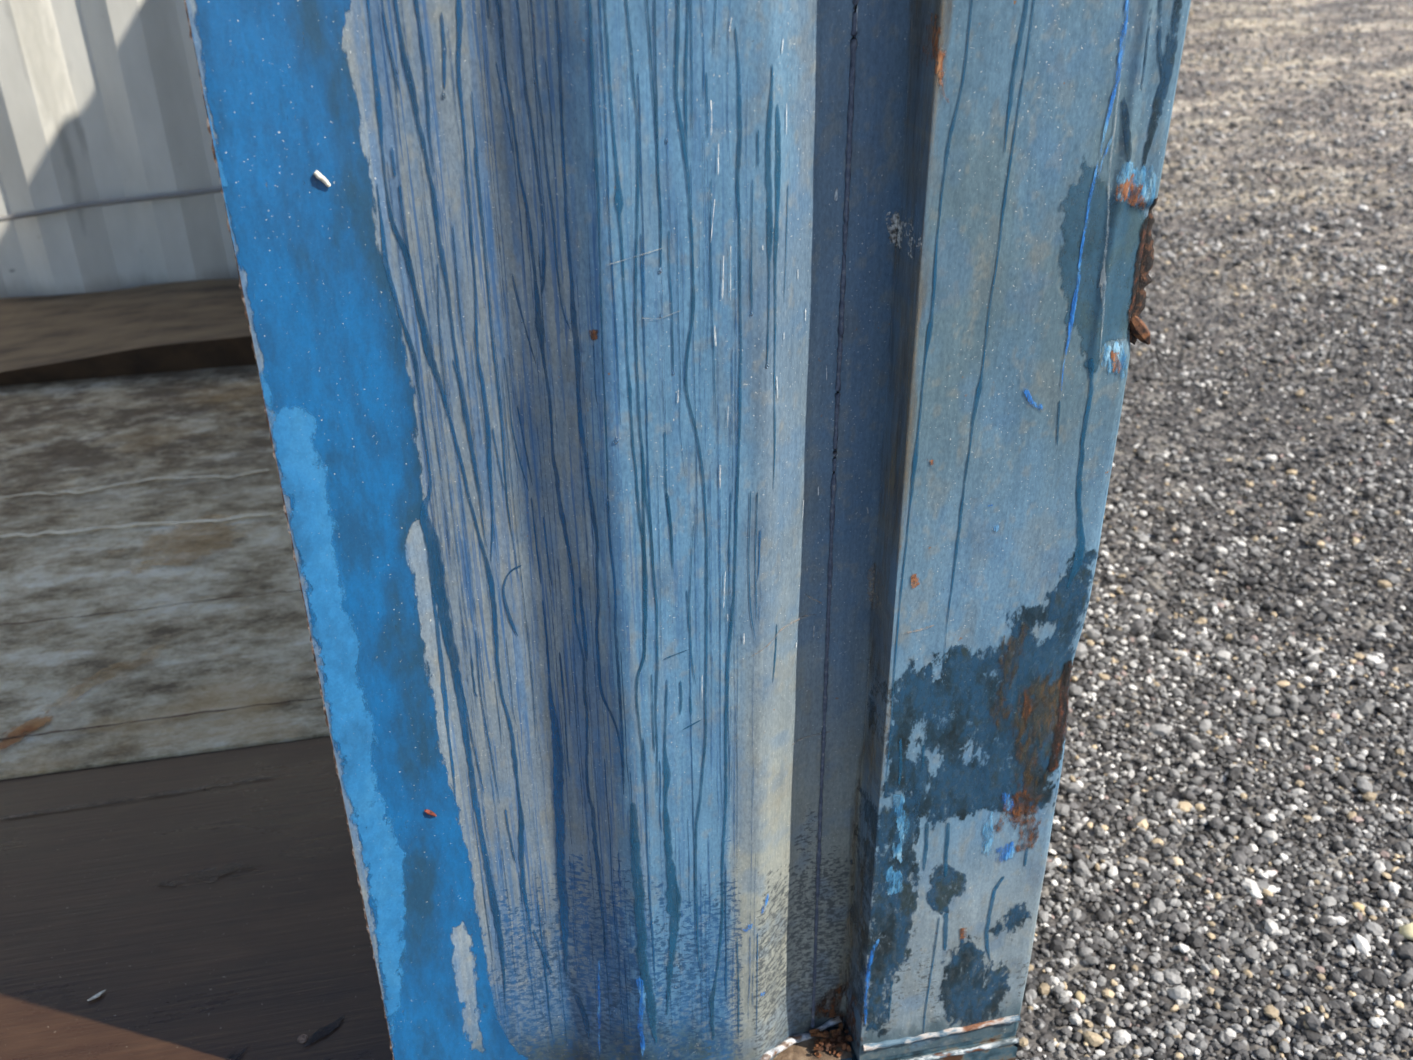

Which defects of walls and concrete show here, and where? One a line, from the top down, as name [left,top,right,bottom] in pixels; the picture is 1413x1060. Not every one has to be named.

rust [910,0,951,156]
rust [1128,216,1150,345]
rust [883,261,921,549]
rust [990,623,1072,852]
peeling [883,794,907,895]
peeling [981,793,1015,861]
rust [811,904,864,1047]